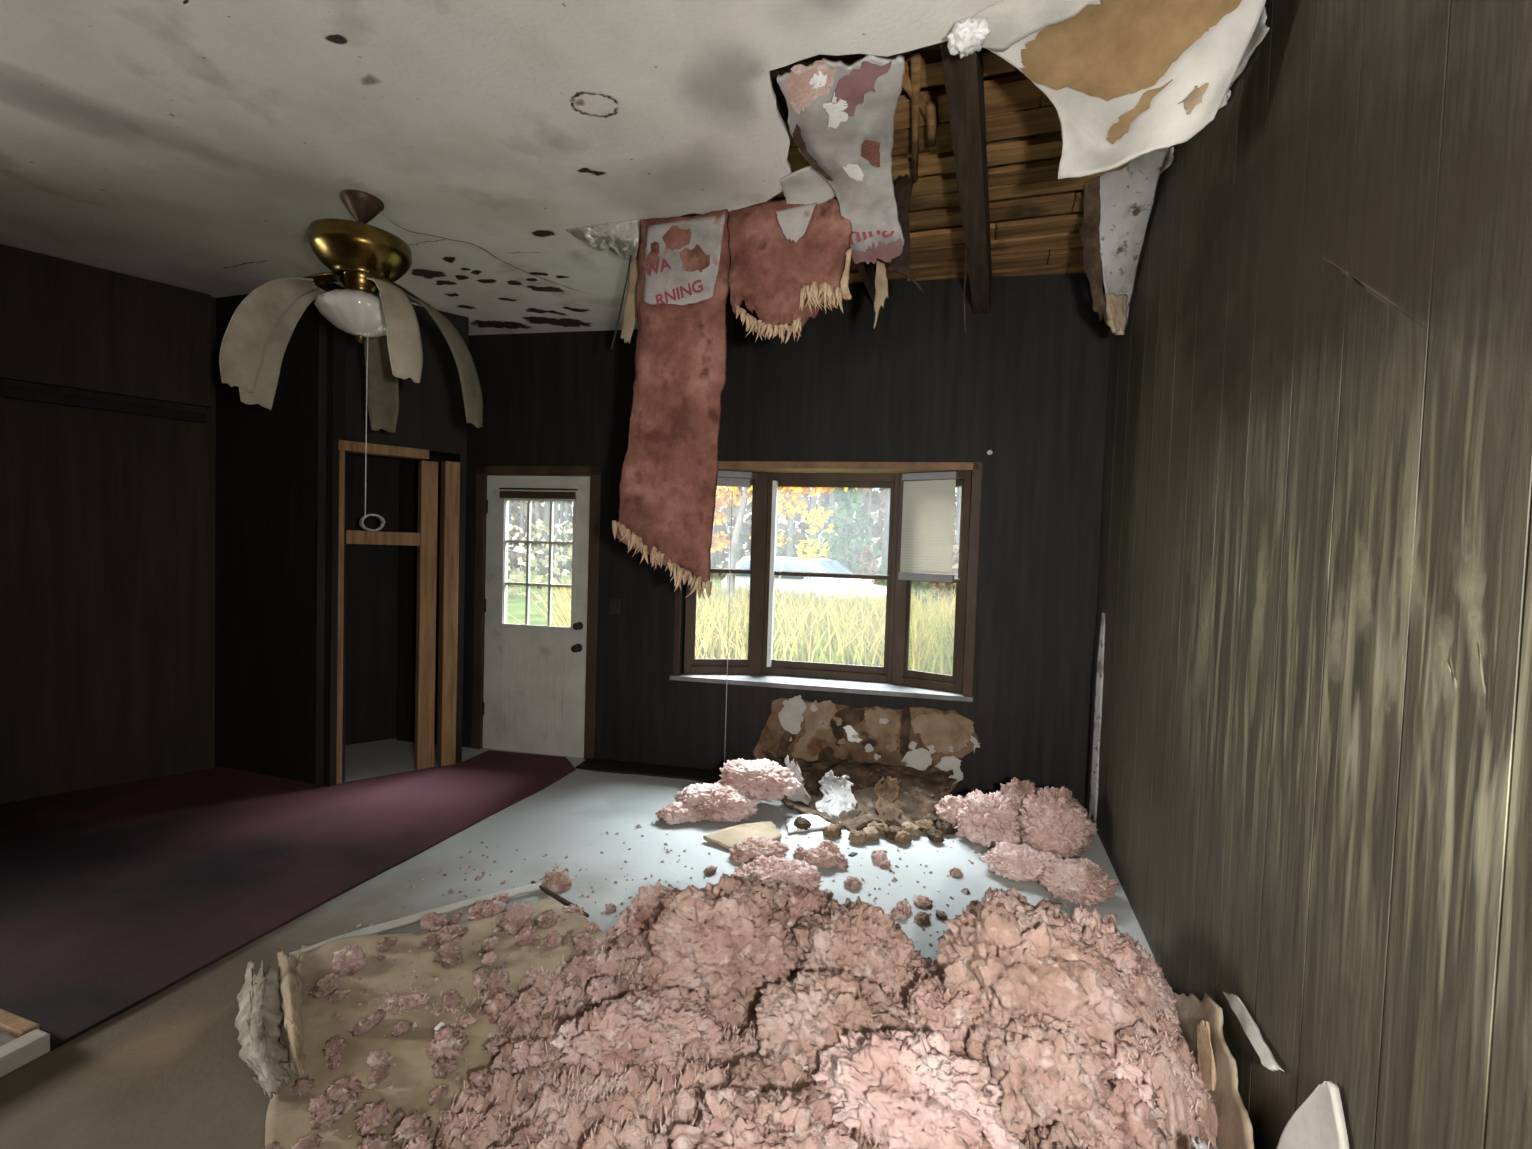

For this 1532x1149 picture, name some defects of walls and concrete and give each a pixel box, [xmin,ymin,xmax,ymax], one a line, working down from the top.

peeling [972,0,1242,144]
peeling [1178,0,1270,114]
peeling [1159,147,1174,175]
damp [412,257,592,331]
peeling [753,695,980,794]